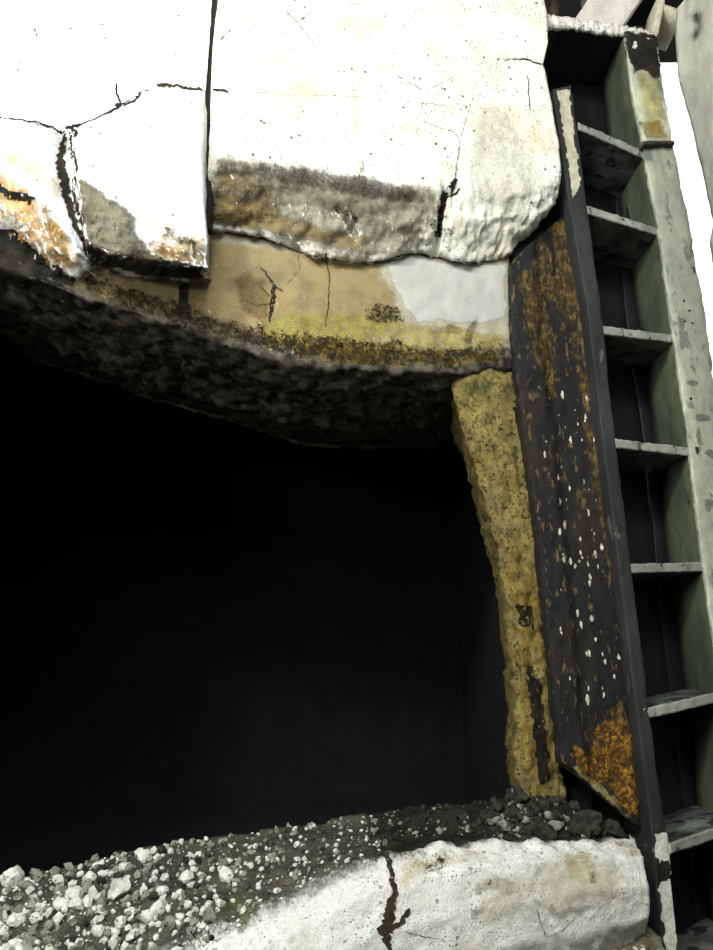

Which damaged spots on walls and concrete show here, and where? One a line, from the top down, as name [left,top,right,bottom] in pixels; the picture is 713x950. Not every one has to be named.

rust [0,151,75,287]
crack [0,0,504,326]
rust [640,74,666,138]
peeling [445,320,476,341]
rust [516,218,606,536]
rust [507,546,553,785]
rust [570,700,639,815]
crack [377,847,453,950]